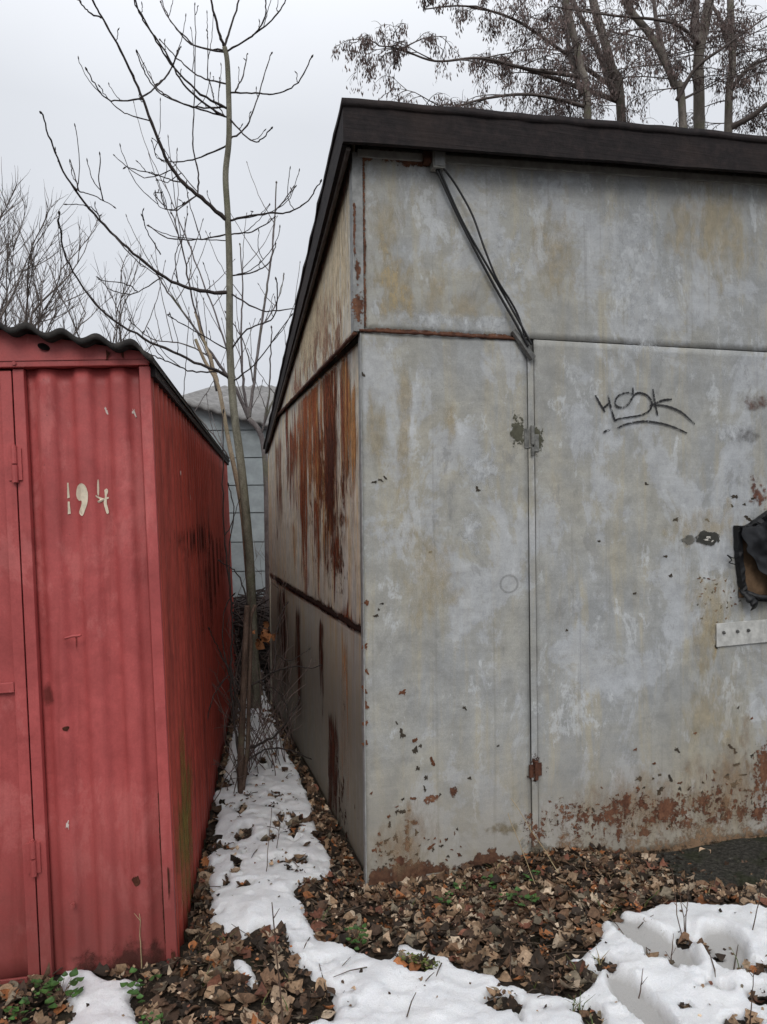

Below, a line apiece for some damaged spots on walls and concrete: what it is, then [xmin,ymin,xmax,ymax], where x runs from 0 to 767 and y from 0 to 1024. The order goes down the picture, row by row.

peeling [510,410,544,457]
corrosion [275,149,513,838]
corrosion [751,477,767,509]
peeling [395,721,435,792]
corrosion [521,740,767,855]
peeling [636,762,705,795]
peeling [713,744,760,788]
peeling [372,798,411,856]